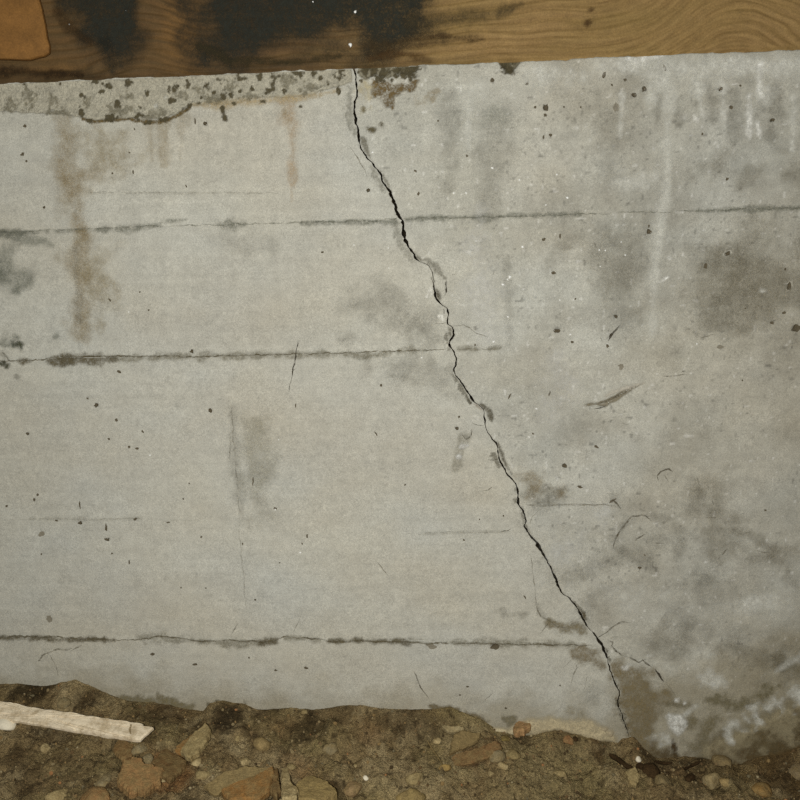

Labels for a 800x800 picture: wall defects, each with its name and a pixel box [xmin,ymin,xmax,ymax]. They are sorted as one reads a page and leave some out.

spalling [0,66,421,125]
crack [346,70,664,735]
water stain [571,646,715,757]